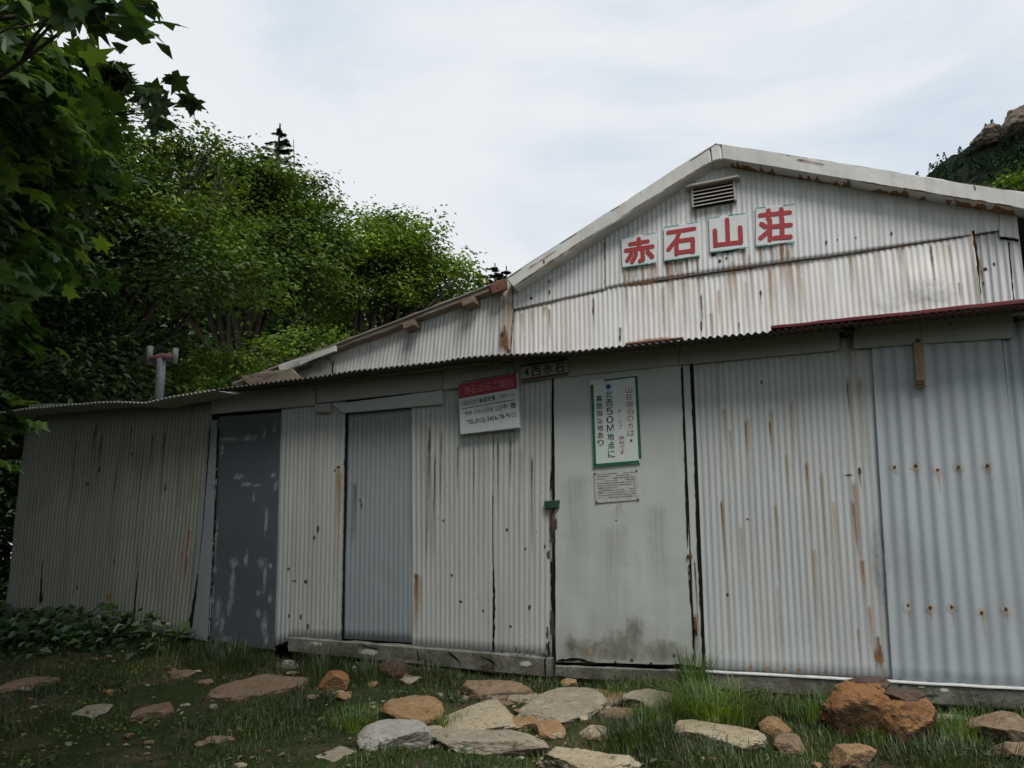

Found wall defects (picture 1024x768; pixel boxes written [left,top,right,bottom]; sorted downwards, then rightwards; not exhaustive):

rust [729,159,1021,217]
rust [625,259,698,302]
rust [727,244,800,278]
rust [499,326,510,353]
peeling [209,555,272,645]